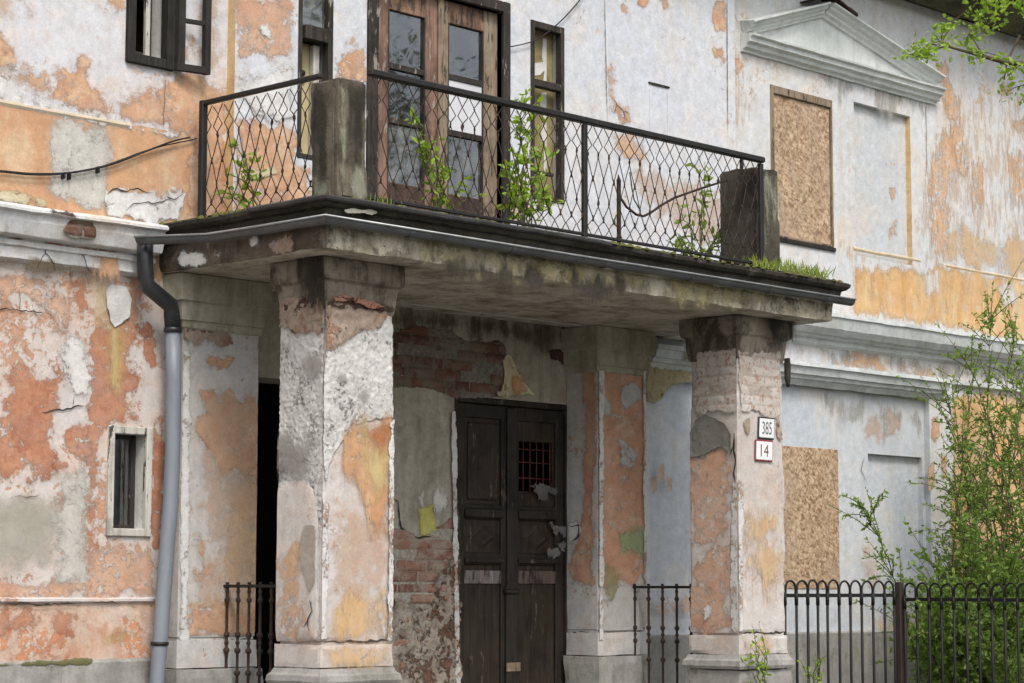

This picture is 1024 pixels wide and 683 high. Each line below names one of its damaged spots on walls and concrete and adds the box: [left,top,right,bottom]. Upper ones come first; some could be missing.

peeling [0,0,312,224]
water stain [311,90,327,183]
water stain [349,83,368,162]
peeling [607,65,720,242]
crack [43,396,89,413]
peeling [0,319,165,638]
peeling [179,328,258,640]
flaking render [276,294,535,683]
water stain [446,258,543,292]
water stain [571,269,650,303]
peeling [568,348,783,655]
water stain [768,318,796,349]